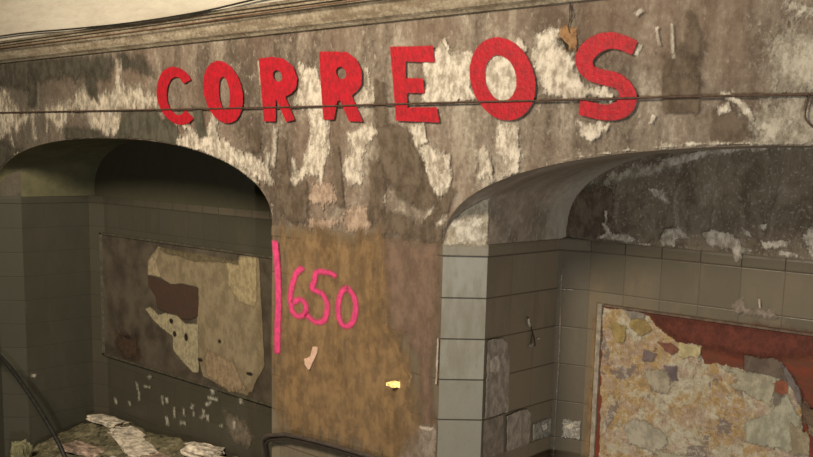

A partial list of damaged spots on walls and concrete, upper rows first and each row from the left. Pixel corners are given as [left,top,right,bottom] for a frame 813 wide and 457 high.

water stain [422,38,476,105]
water stain [485,55,516,100]
water stain [514,28,613,102]
water stain [473,122,523,182]
water stain [575,118,609,141]
spalling [584,141,810,190]
spalling [648,188,669,203]